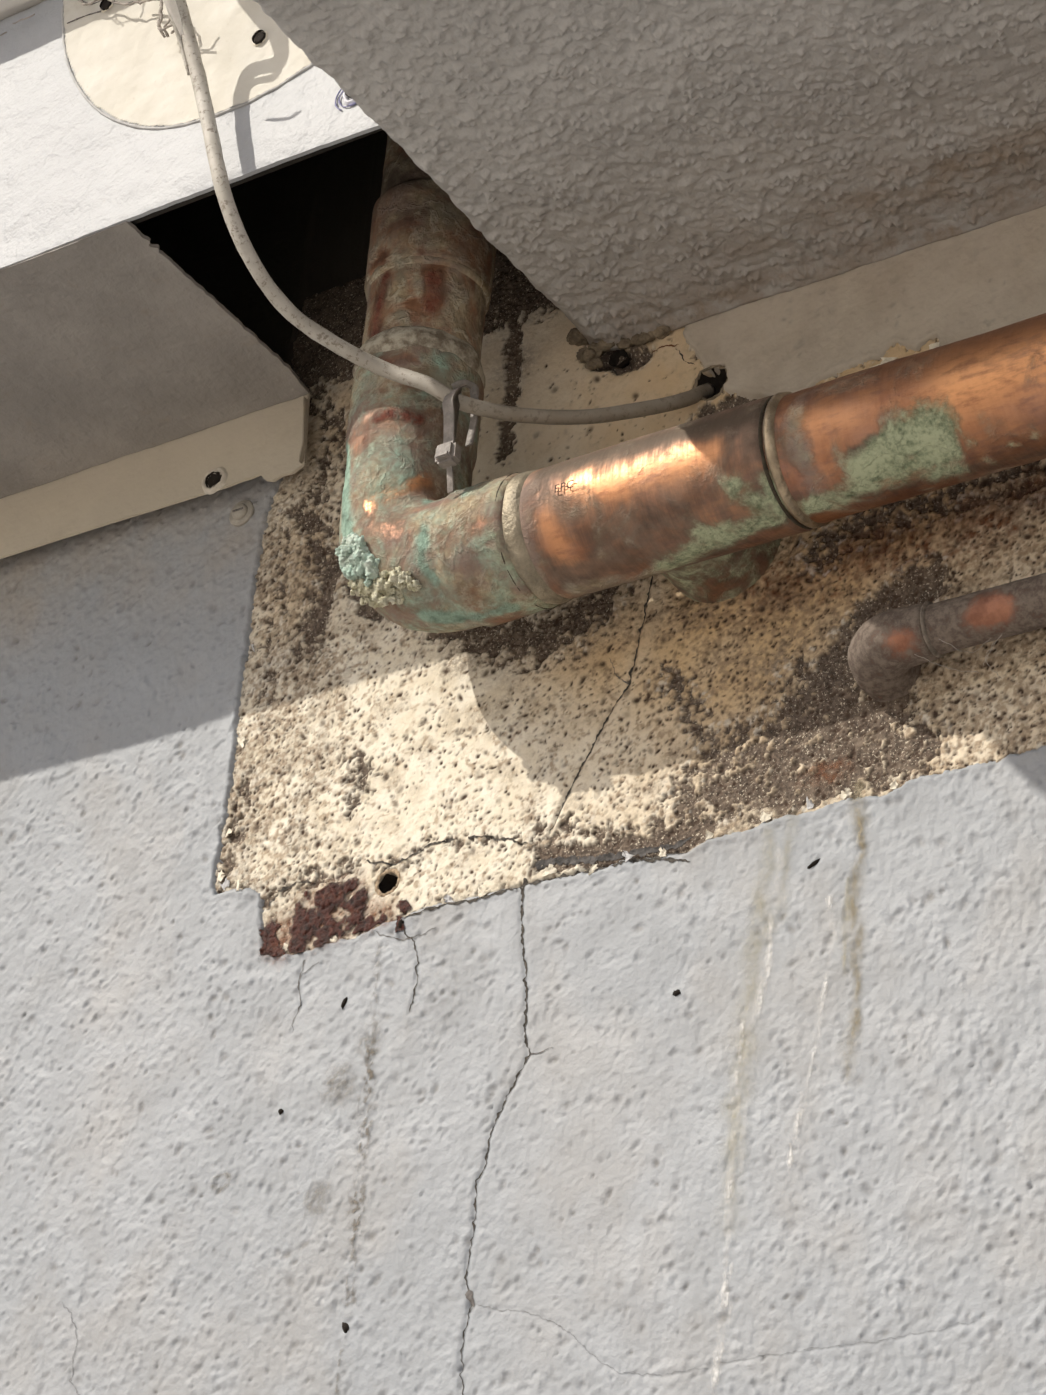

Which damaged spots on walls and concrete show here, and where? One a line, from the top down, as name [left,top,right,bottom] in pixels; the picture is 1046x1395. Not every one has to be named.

crack [366,576,653,866]
peeling [215,249,1046,955]
crack [268,880,316,908]
crack [292,960,319,1030]
rust [259,877,411,957]
crack [376,851,973,1395]